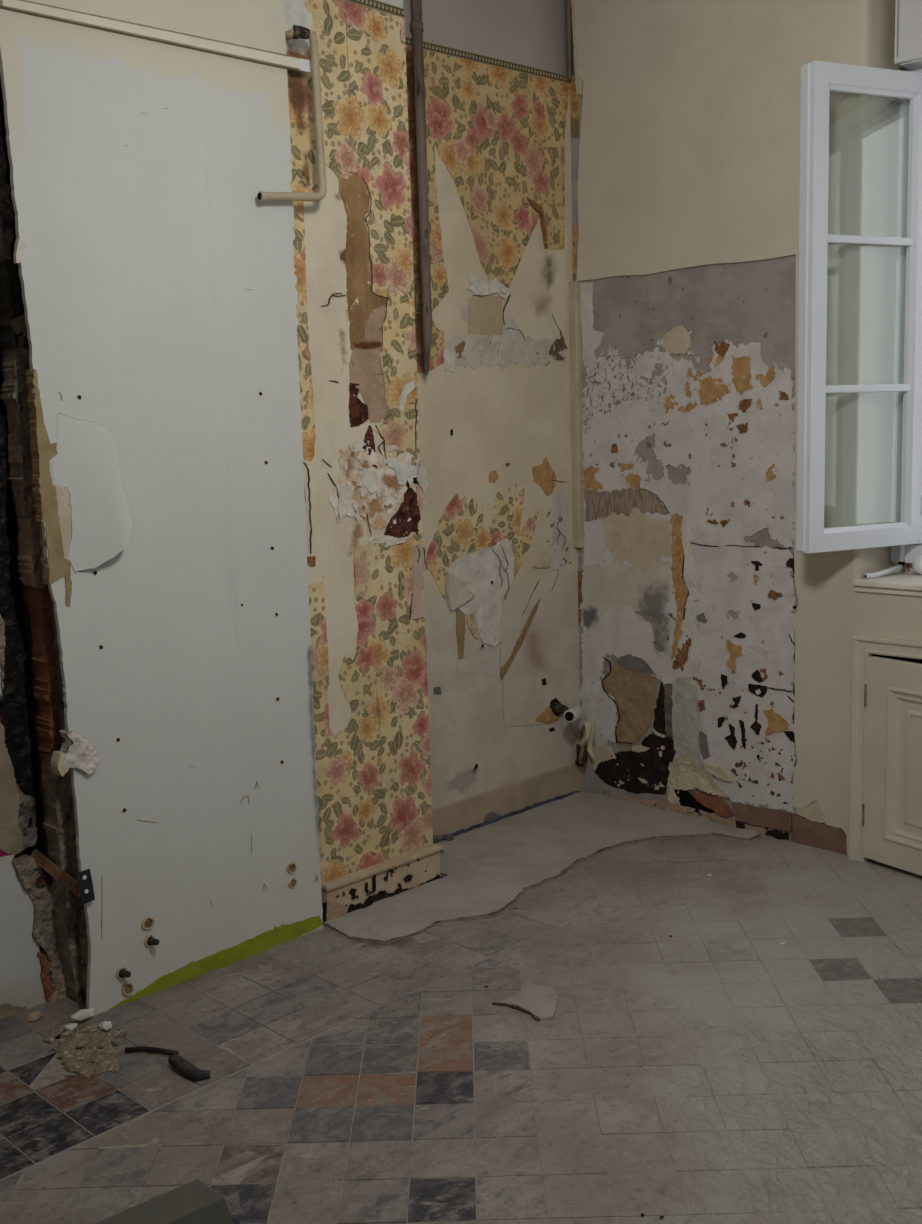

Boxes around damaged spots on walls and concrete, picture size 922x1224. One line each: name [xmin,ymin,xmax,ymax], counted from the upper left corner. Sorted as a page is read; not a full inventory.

flaking render [284,0,313,55]
flaking render [571,137,580,226]
flaking render [337,174,429,547]
flaking render [446,273,567,370]
peeling [56,486,71,557]
flaking render [445,538,515,649]
peeling [549,282,826,823]
peeling [0,723,23,855]
spalling [610,795,793,841]
peeling [365,874,388,896]